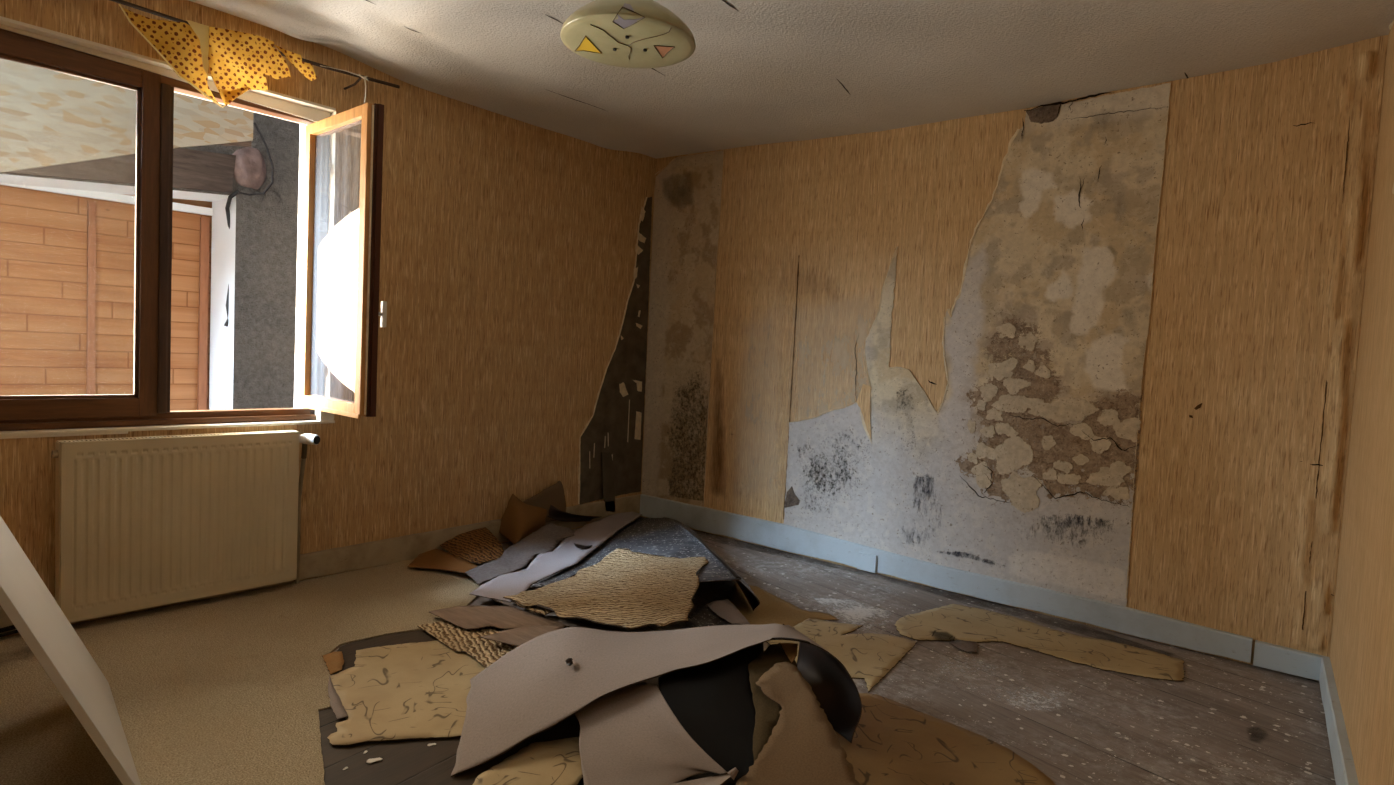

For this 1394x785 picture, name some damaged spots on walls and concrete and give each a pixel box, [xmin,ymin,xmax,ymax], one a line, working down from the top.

flaking render [784,83,1171,607]
damp [667,372,722,501]
damp [902,475,941,544]
damp [1032,515,1112,543]